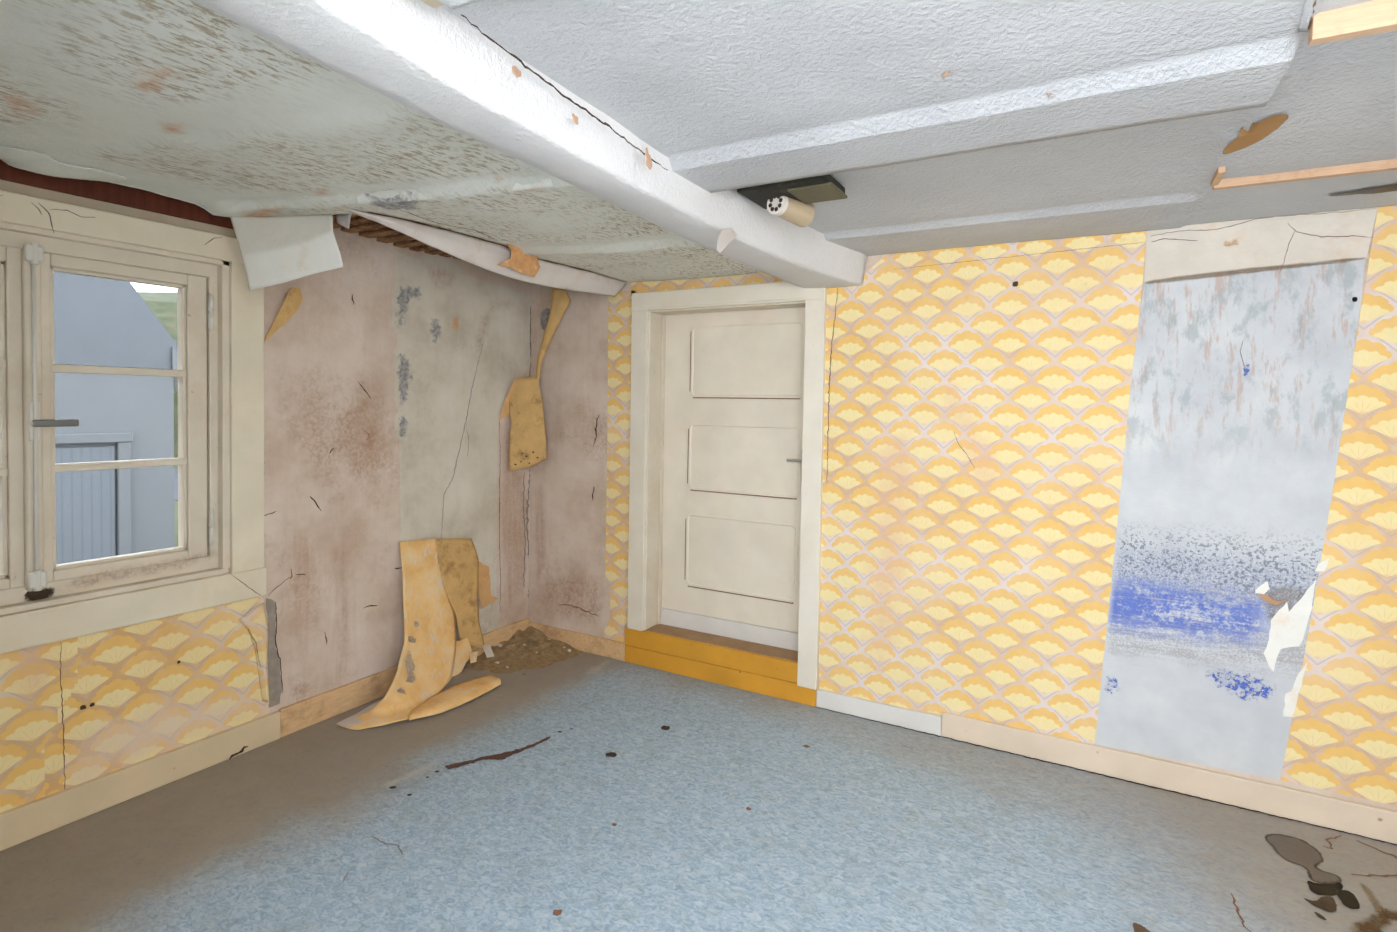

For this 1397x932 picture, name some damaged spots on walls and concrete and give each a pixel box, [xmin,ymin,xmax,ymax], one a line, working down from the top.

crack [441,342,500,539]
peeling [1255,559,1329,672]
peeling [1283,663,1307,717]
water stain [1265,834,1397,932]